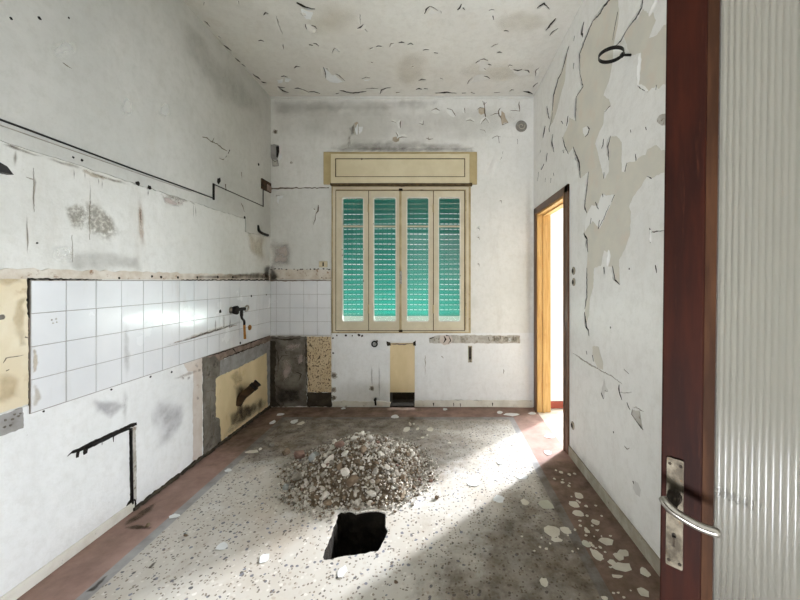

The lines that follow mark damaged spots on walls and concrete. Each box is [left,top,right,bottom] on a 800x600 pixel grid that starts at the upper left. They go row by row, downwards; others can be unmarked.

peeling [296,2,317,33]
peeling [478,102,508,131]
peeling [549,0,666,321]
flaking render [0,279,29,436]
peeling [202,336,337,454]
peeling [631,406,644,430]